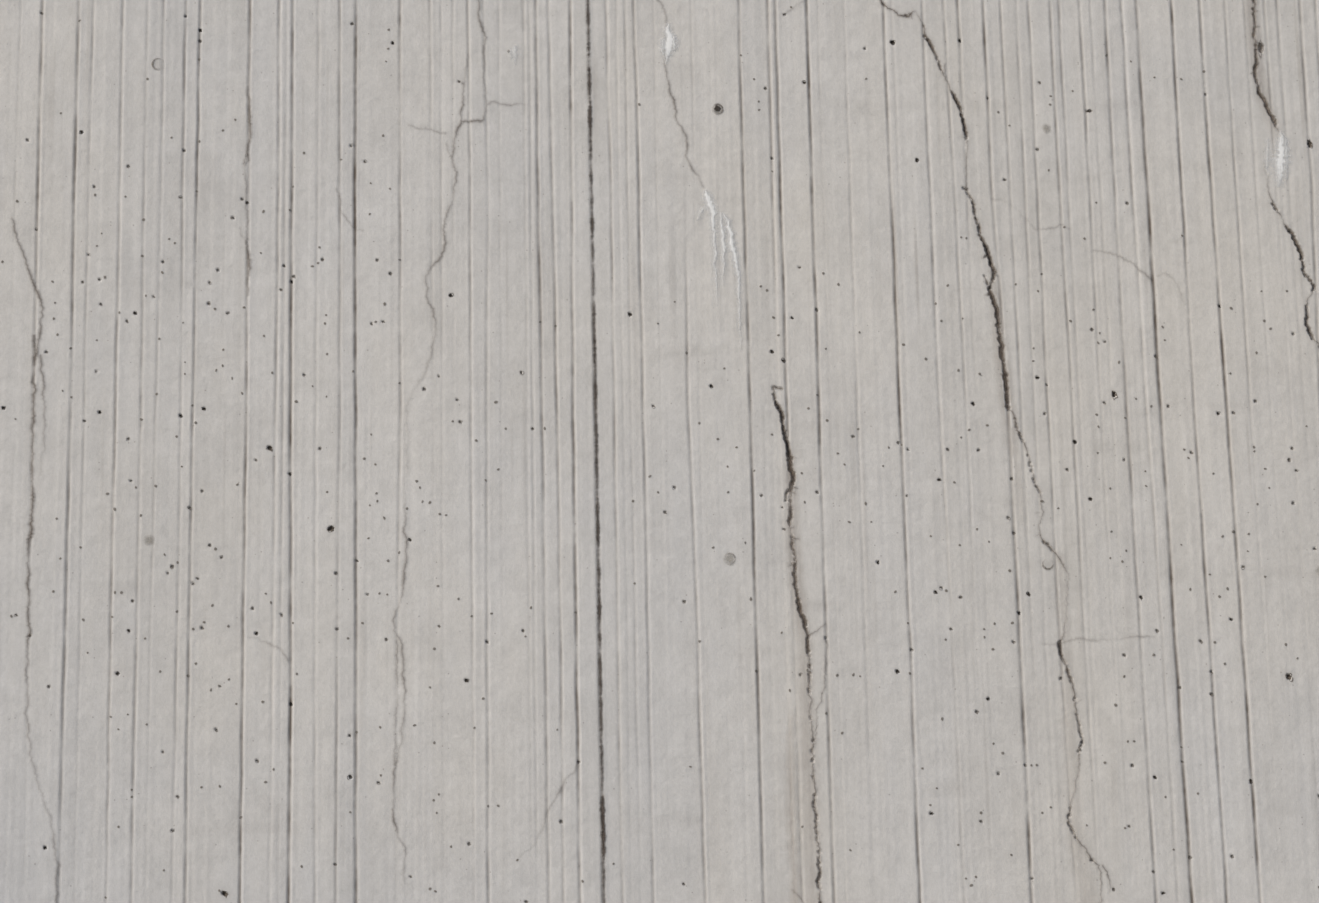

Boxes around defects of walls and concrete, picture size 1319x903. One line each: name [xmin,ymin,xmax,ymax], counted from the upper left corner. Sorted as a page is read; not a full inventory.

crack [881,0,967,139]
crack [1253,0,1276,127]
damp [1266,132,1288,183]
damp [700,190,741,318]
crack [965,188,1027,450]
crack [1272,200,1318,343]
crack [27,487,35,543]
crack [773,386,810,678]
crack [1059,643,1083,748]